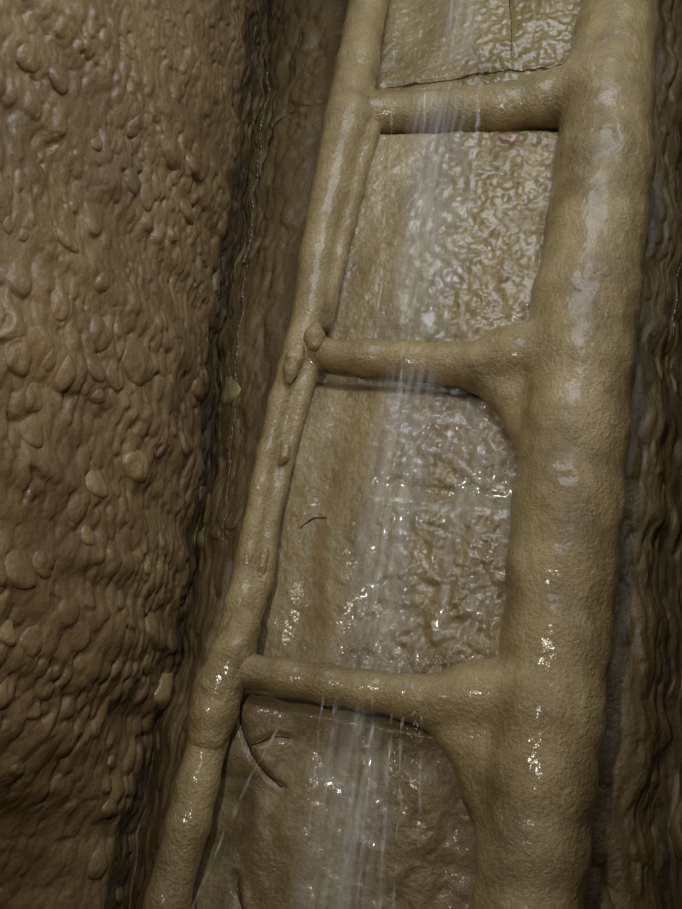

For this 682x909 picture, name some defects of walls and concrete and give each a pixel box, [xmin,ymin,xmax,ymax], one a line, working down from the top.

crack [389,0,562,88]
damp [412,180,464,291]
damp [409,287,449,341]
damp [360,383,500,614]
damp [439,577,451,624]